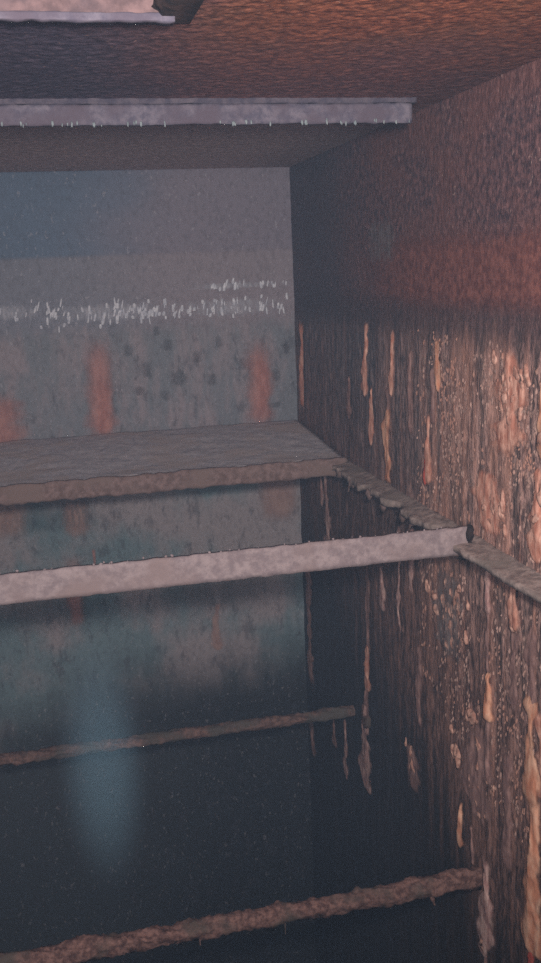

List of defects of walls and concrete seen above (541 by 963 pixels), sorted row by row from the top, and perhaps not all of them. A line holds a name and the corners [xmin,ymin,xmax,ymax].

rust [320,476,331,540]
rust [346,324,394,482]
rust [423,341,440,485]
rust [527,386,541,563]
rust [332,560,414,794]
rust [483,570,493,780]
rust [501,586,541,963]
rust [456,803,495,963]